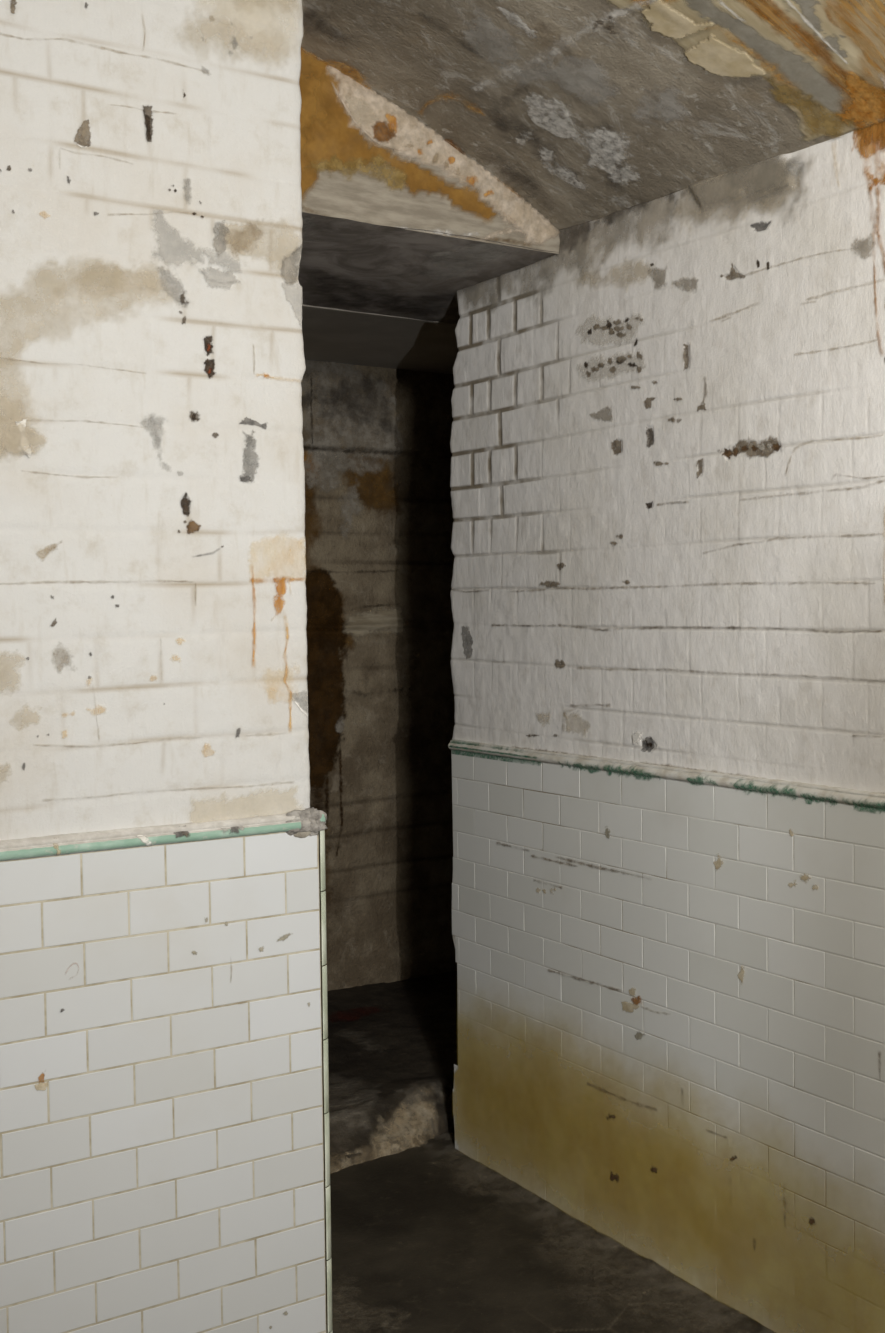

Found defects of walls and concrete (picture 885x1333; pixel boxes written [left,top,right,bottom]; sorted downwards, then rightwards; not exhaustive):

peeling [609,0,885,141]
rust [299,48,496,220]
damp [85,211,200,324]
spalling [281,245,302,320]
damp [432,193,675,309]
flaking render [579,317,657,409]
spalling [240,417,267,482]
damp [301,359,402,489]
spalling [646,428,654,447]
spalling [722,437,781,459]
damp [305,569,347,832]
damp [455,1041,885,1333]